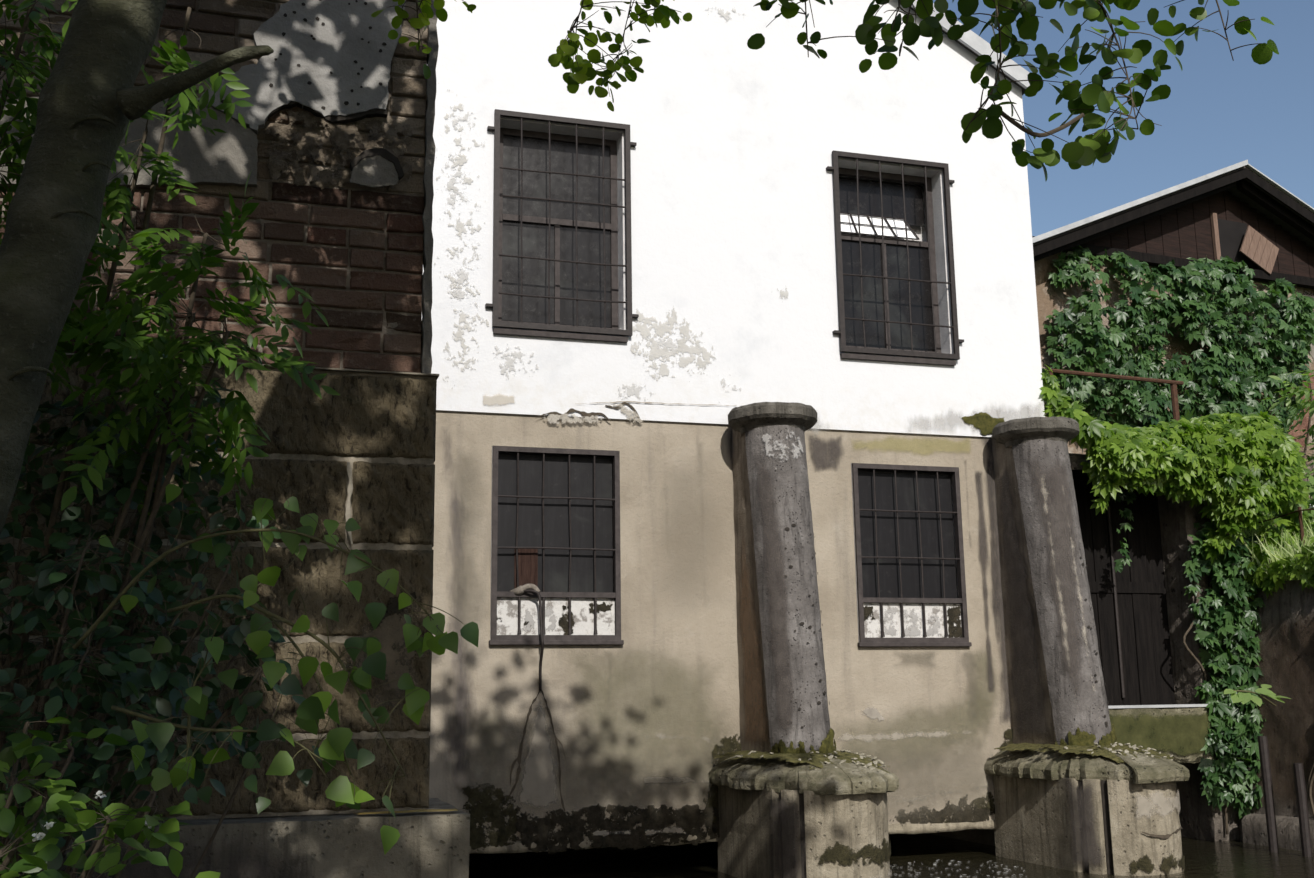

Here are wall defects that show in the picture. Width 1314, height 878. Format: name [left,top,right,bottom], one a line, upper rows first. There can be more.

spalling [264,101,413,192]
peeling [434,89,539,389]
peeling [538,308,741,425]
peeling [762,431,803,469]